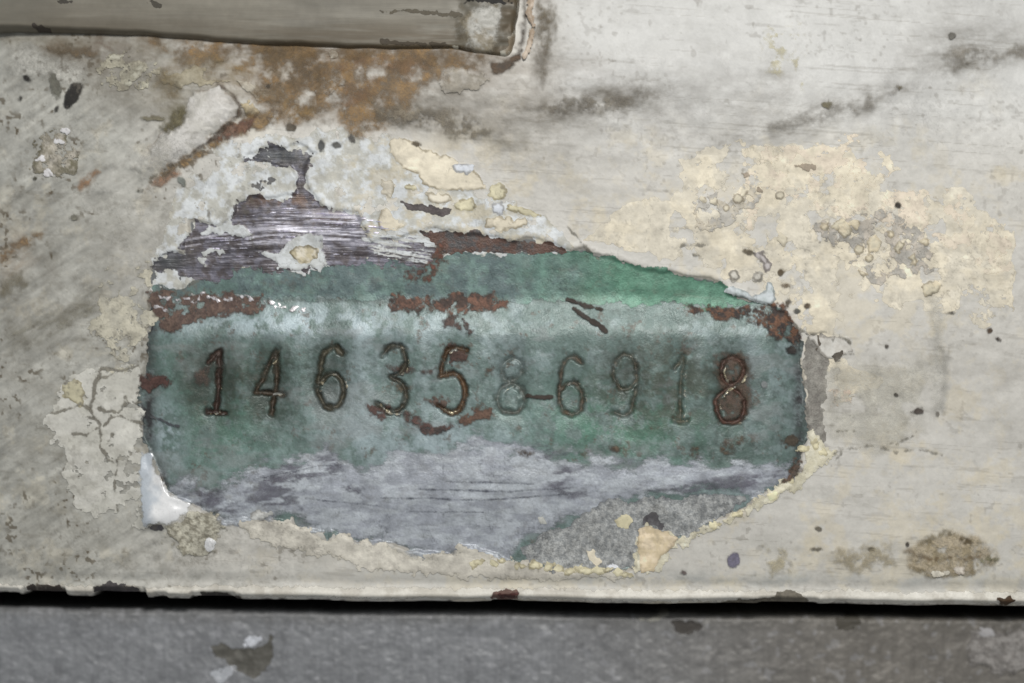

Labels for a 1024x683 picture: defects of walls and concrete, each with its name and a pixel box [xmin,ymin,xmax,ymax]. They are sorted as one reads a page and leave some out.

corrosion [149,13,527,187]
corrosion [404,243,445,282]
corrosion [146,289,306,332]
corrosion [388,291,508,334]
corrosion [688,302,801,344]
peeling [43,124,1017,599]
crack [50,365,143,511]
leakage [908,533,998,577]